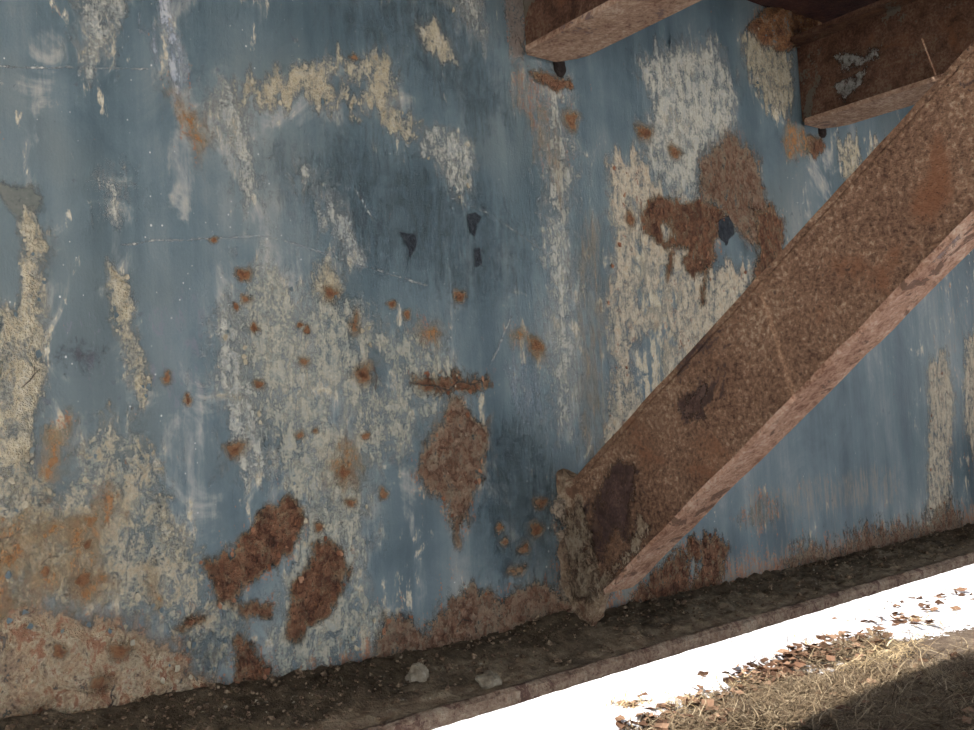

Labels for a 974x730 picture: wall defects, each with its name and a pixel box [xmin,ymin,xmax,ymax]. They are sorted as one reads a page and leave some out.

peeling [73,0,127,83]
peeling [152,0,187,108]
peeling [204,43,475,210]
peeling [415,16,458,66]
corrosion [747,6,822,54]
corrosion [626,128,787,306]
peeling [0,204,249,683]
peeling [208,164,474,677]
corrosion [412,366,493,550]
corrosion [0,481,222,720]
corrosion [232,632,272,684]
corrosion [199,495,352,644]